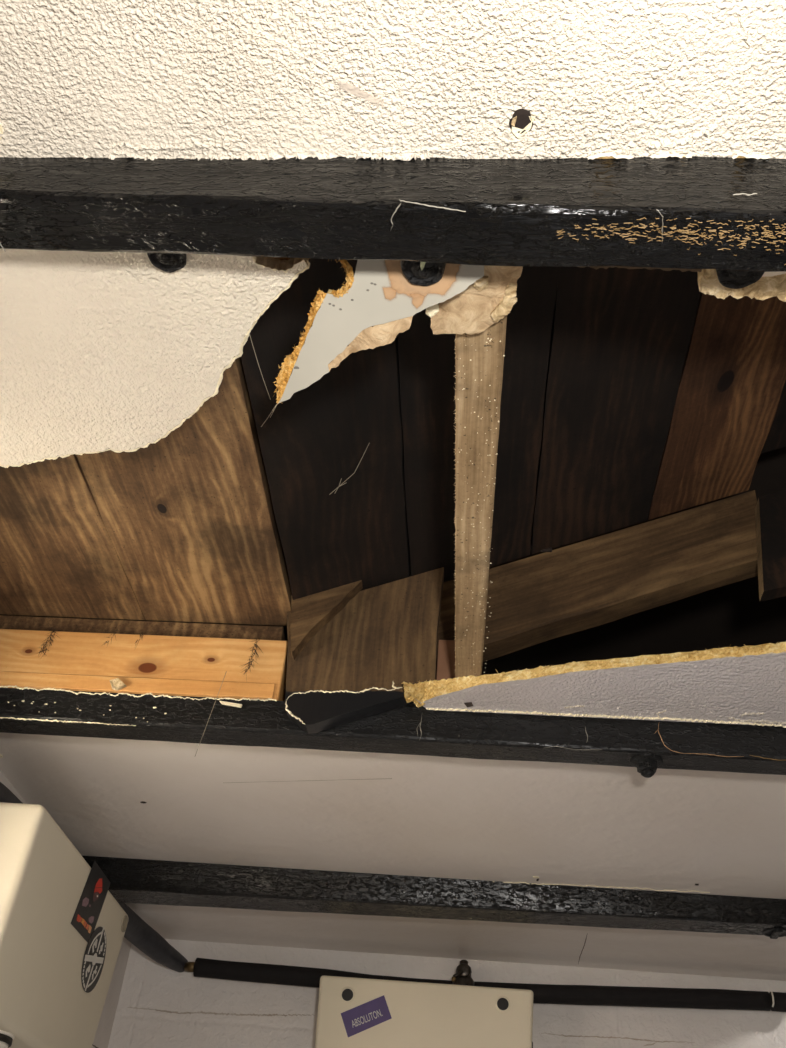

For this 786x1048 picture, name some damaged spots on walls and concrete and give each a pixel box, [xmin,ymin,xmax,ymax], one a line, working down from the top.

peeling [426,303,439,318]
peeling [490,283,517,322]
flaking render [0,678,277,726]
crack [541,1033,695,1046]